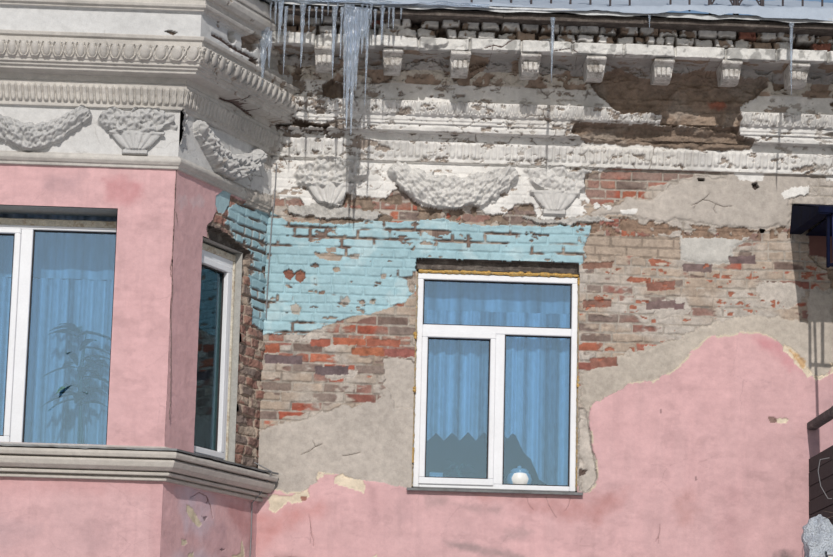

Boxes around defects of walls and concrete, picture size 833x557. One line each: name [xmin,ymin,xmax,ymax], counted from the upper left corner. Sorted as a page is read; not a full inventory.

crack [169,171,178,420]
spalling [203,168,833,513]